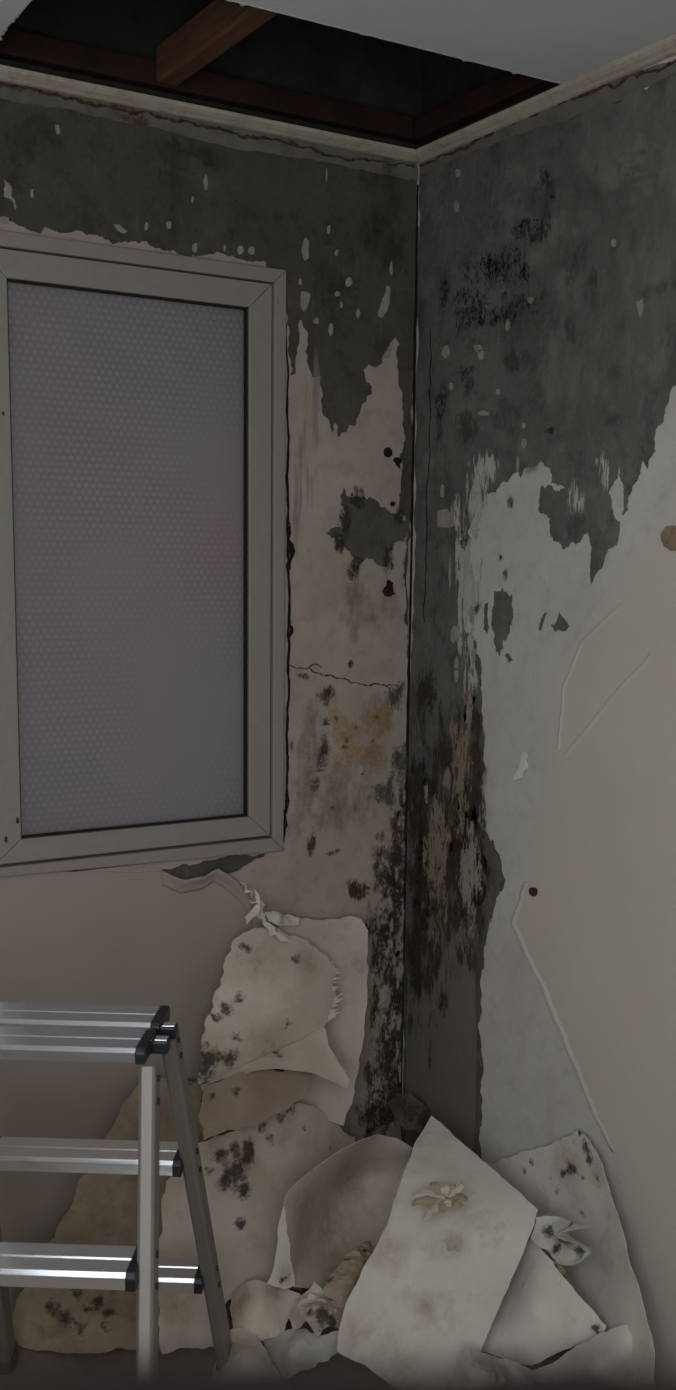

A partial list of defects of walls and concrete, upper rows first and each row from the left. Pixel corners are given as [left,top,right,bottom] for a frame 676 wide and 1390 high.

water stain [439,209,588,335]
water stain [539,111,676,434]
water stain [307,833,339,856]
crack [0,59,676,1091]
peeling [0,73,676,1159]
water stain [312,661,491,1153]